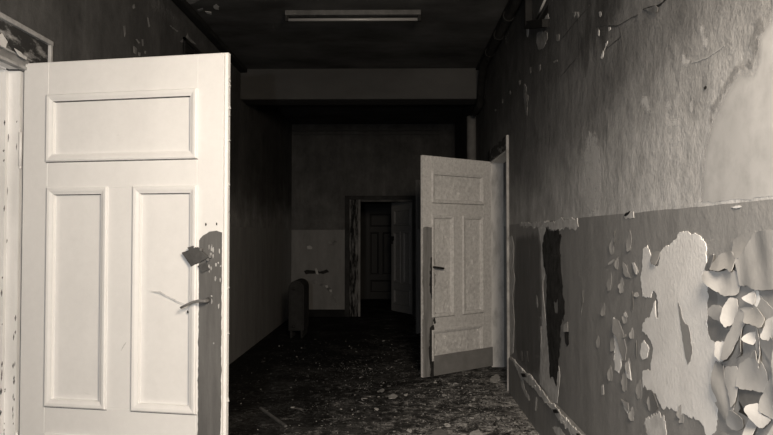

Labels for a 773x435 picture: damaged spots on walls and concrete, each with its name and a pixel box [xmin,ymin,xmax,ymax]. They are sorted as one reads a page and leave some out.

crack [562,0,666,49]
leakage [702,23,773,203]
flaking render [509,217,583,435]
peeling [601,229,773,435]